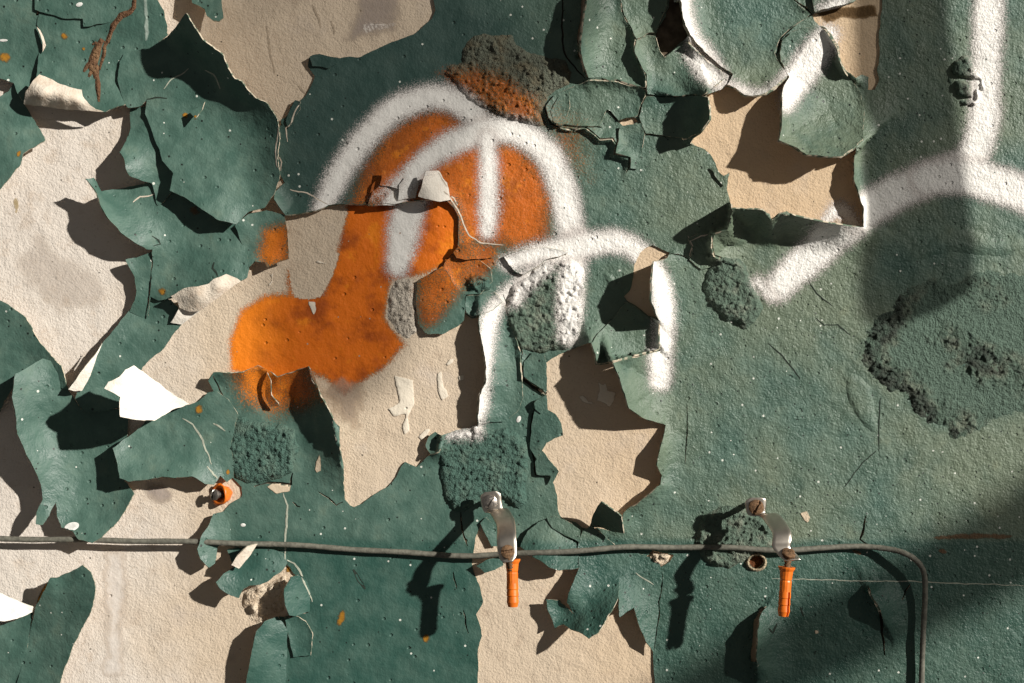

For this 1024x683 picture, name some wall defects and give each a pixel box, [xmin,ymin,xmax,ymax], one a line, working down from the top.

peeling [0,0,435,683]
peeling [367,170,450,206]
peeling [311,242,673,683]
peeling [444,0,882,227]